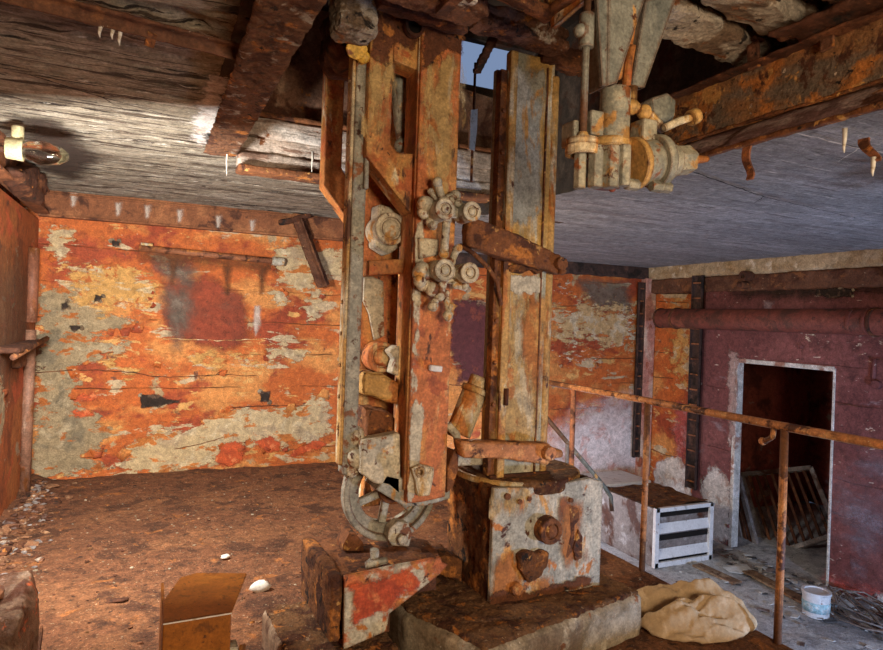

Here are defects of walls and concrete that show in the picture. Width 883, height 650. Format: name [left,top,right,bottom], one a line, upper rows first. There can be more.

peeling [268,246,328,321]
peeling [318,243,342,277]
peeling [32,264,334,480]
peeling [700,467,732,544]